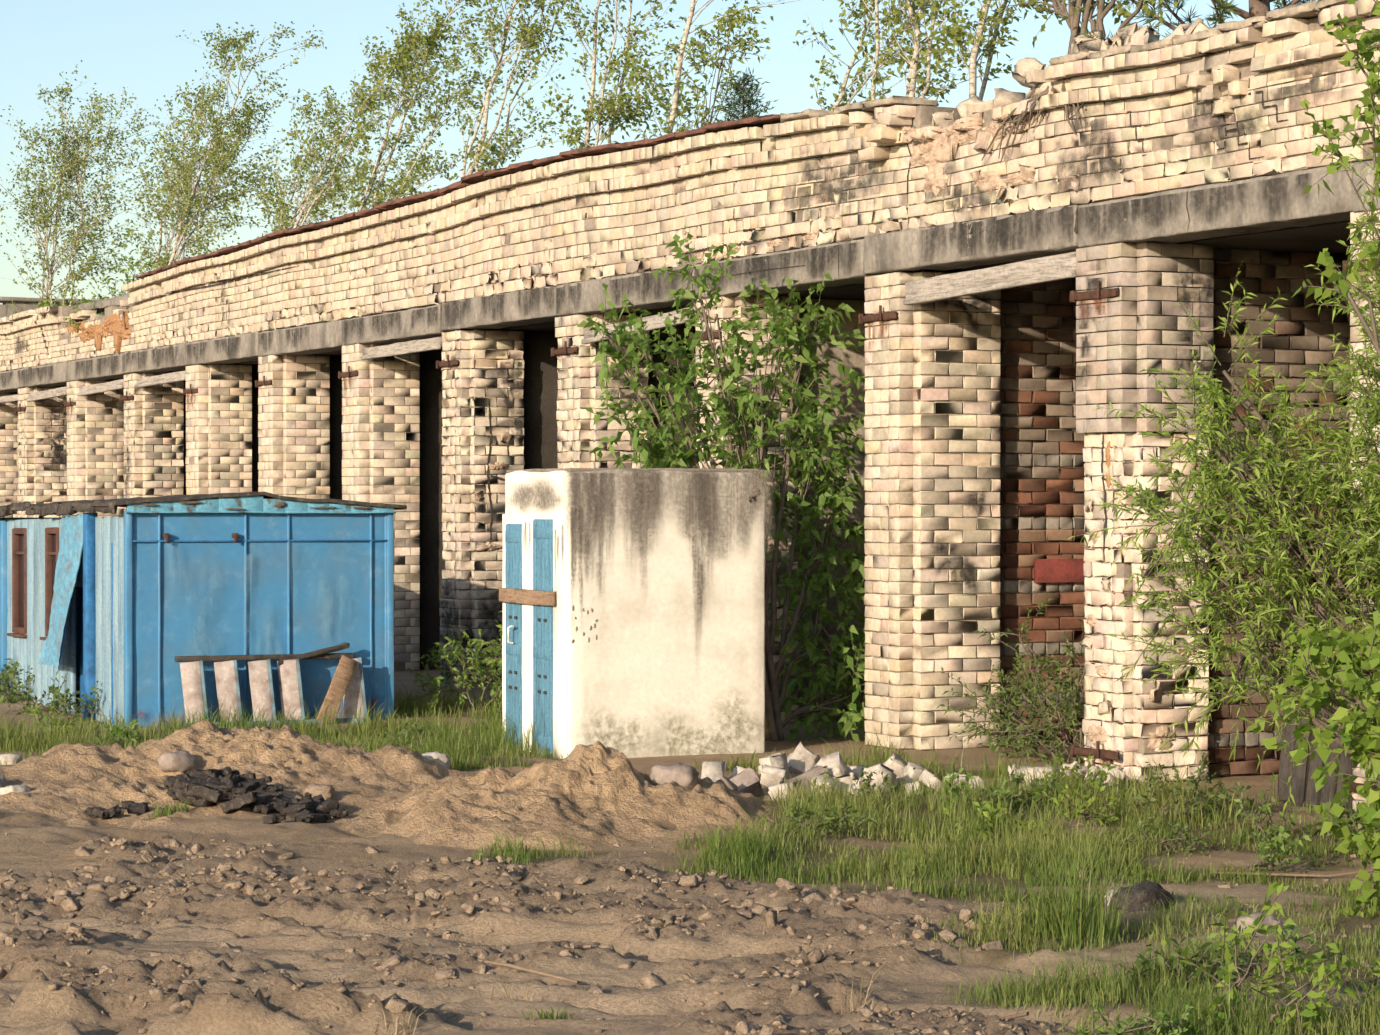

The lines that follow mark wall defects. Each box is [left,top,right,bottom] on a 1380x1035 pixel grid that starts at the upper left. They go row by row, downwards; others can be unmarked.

spalling [904,112,1036,199]
leakage [926,121,1245,253]
leakage [1264,173,1308,209]
leakage [514,469,769,621]